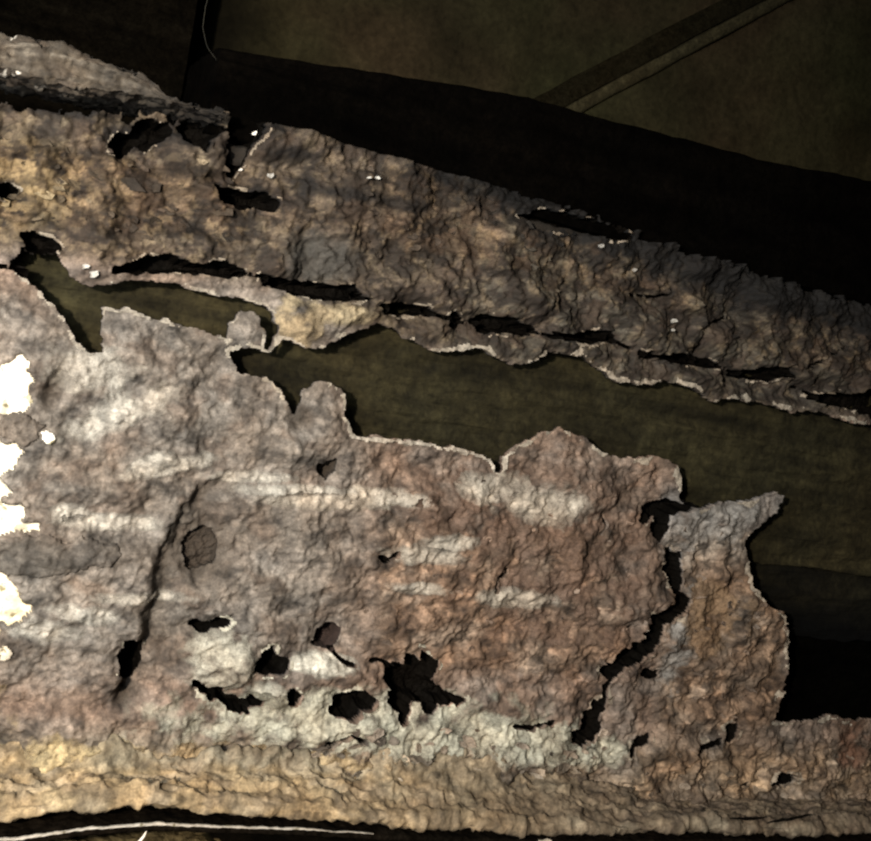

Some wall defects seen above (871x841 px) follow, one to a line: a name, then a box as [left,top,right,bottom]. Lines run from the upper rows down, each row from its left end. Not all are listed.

spalling [361,166,749,331]
crack [111,252,871,419]
peeling [0,354,35,415]
peeling [41,430,56,445]
peeling [0,441,40,536]
peeling [0,572,32,631]
spalling [363,515,635,690]
crack [513,545,689,750]
spalling [663,520,784,737]
corrosion [26,735,101,774]
spalling [630,743,871,806]
crack [730,814,811,824]